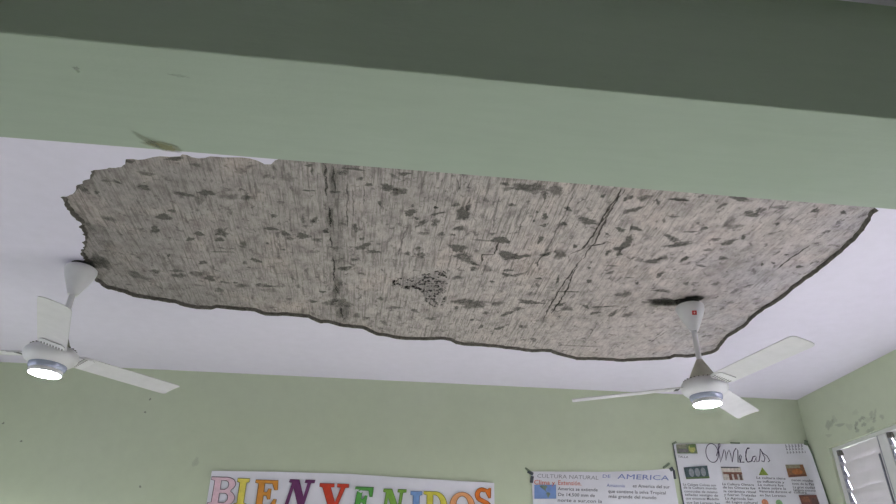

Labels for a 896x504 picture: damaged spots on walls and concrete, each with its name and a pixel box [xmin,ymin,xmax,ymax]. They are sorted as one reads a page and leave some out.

damp [148,142,177,151]
crack [324,166,343,316]
spalling [60,154,879,362]
crack [544,188,626,317]